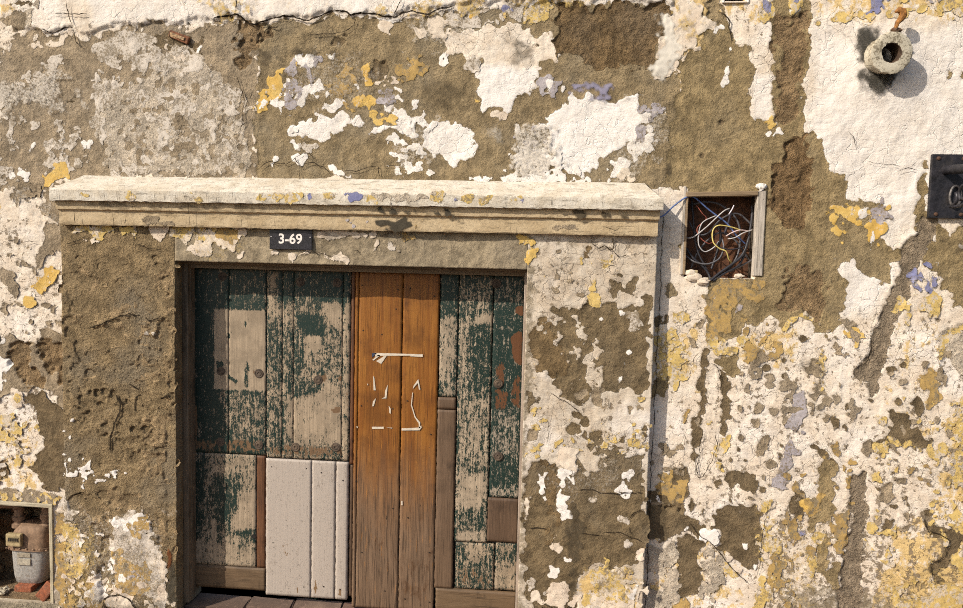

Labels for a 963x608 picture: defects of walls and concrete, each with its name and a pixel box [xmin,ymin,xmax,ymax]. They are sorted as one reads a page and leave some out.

crack [42,2,87,46]
peeling [0,0,963,484]
peeling [0,299,178,608]
peeling [519,323,963,608]